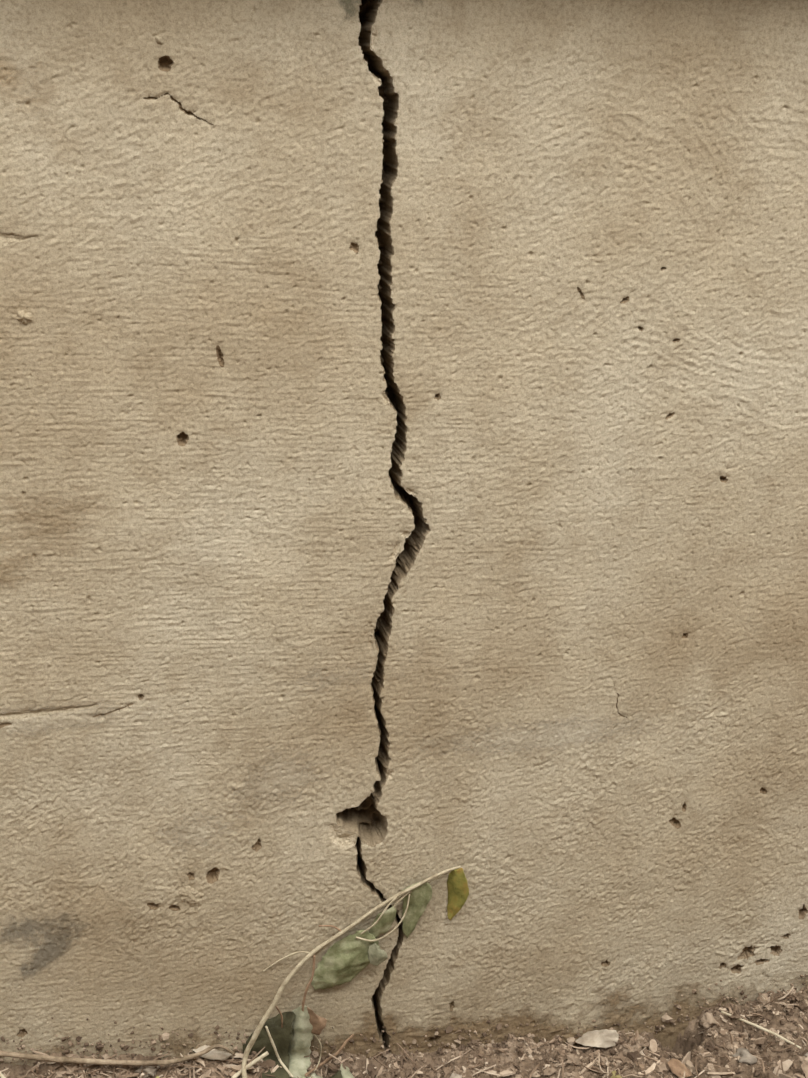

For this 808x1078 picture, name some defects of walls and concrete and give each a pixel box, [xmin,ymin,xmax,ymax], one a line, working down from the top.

crack [358,0,431,805]
crack [353,835,404,1053]